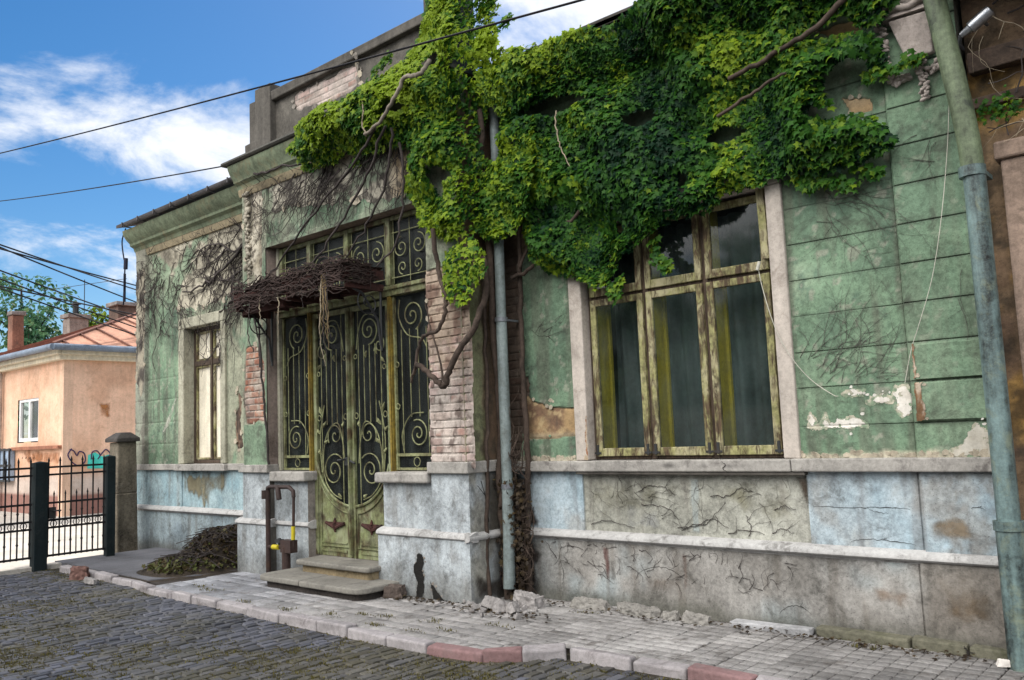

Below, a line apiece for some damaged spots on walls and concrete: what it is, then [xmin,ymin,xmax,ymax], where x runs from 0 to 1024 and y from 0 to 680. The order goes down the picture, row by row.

flaking render [291,50,363,111]
flaking render [842,93,873,114]
flaking render [134,143,421,396]
flaking render [504,225,588,461]
flaking render [234,341,268,452]
peeling [807,344,929,435]
peeling [800,418,990,458]
damp [187,473,224,507]
spalling [414,553,445,601]